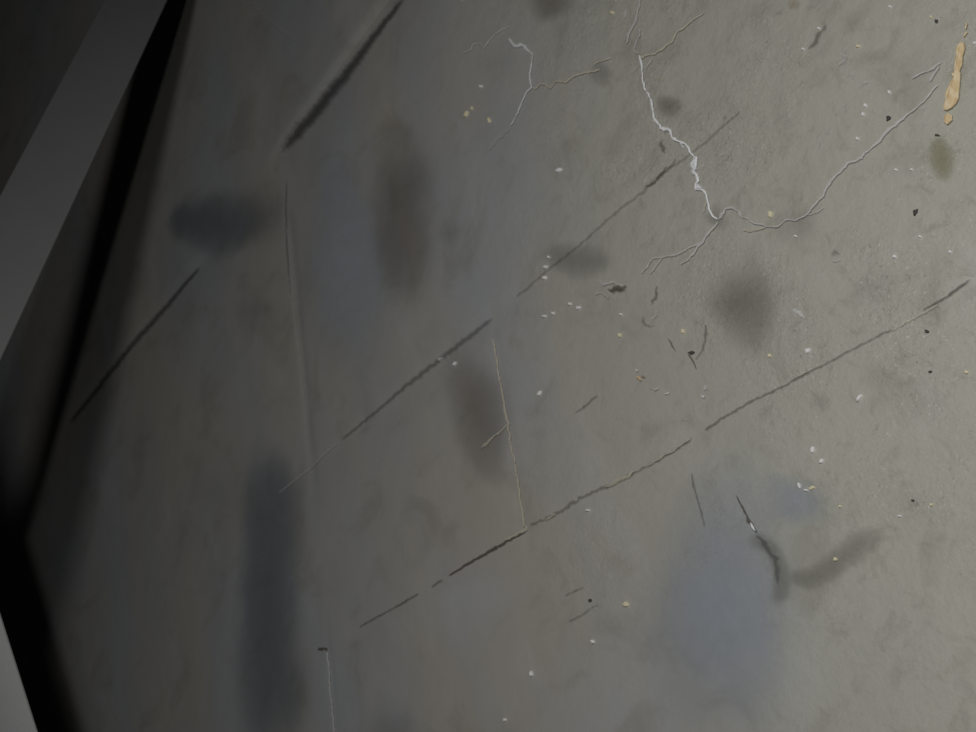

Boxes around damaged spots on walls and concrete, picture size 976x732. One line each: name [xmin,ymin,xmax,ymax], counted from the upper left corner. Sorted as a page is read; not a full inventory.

crack [509,0,941,273]
crack [924,279,970,309]
crack [450,340,554,575]
crack [736,496,756,532]